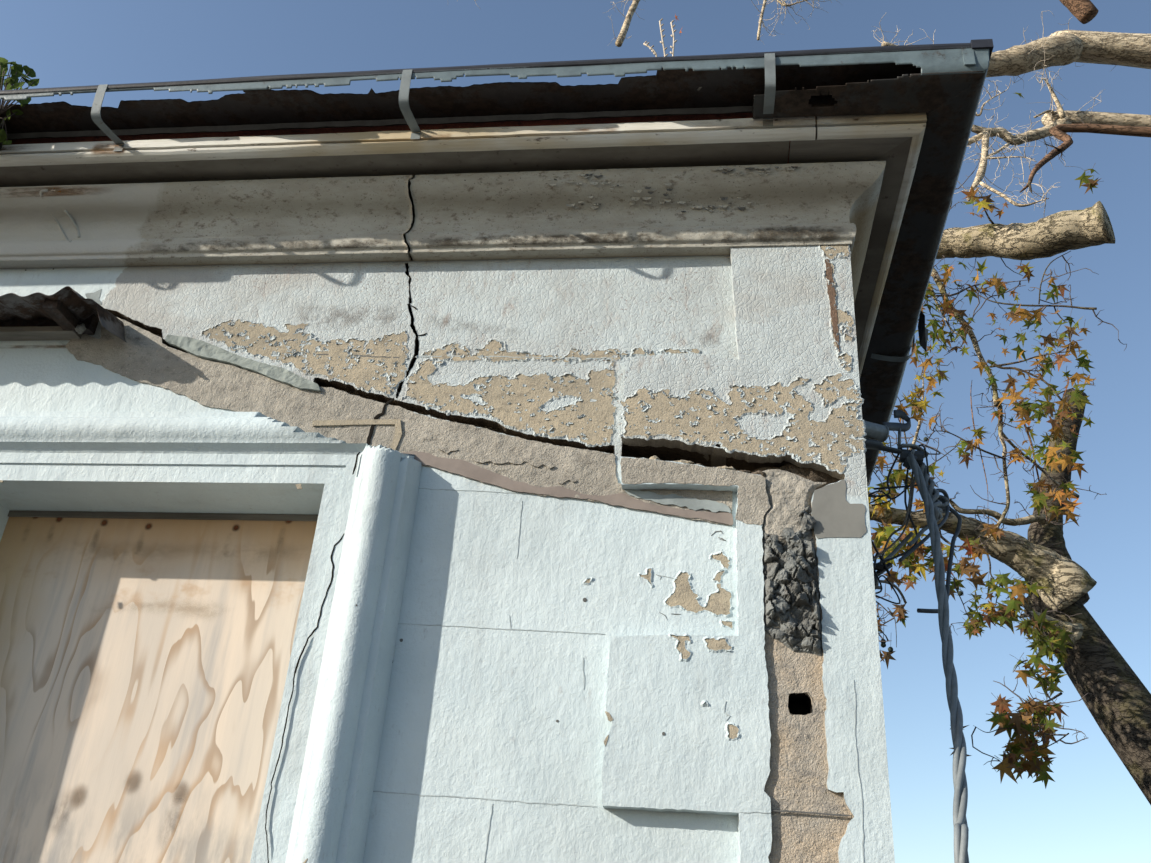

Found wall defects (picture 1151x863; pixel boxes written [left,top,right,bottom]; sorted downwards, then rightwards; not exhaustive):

crack [106,243,615,475]
flaking render [66,245,867,526]
crack [265,534,344,863]
peeling [637,567,654,588]
peeling [663,549,735,662]
flaking render [763,598,854,863]